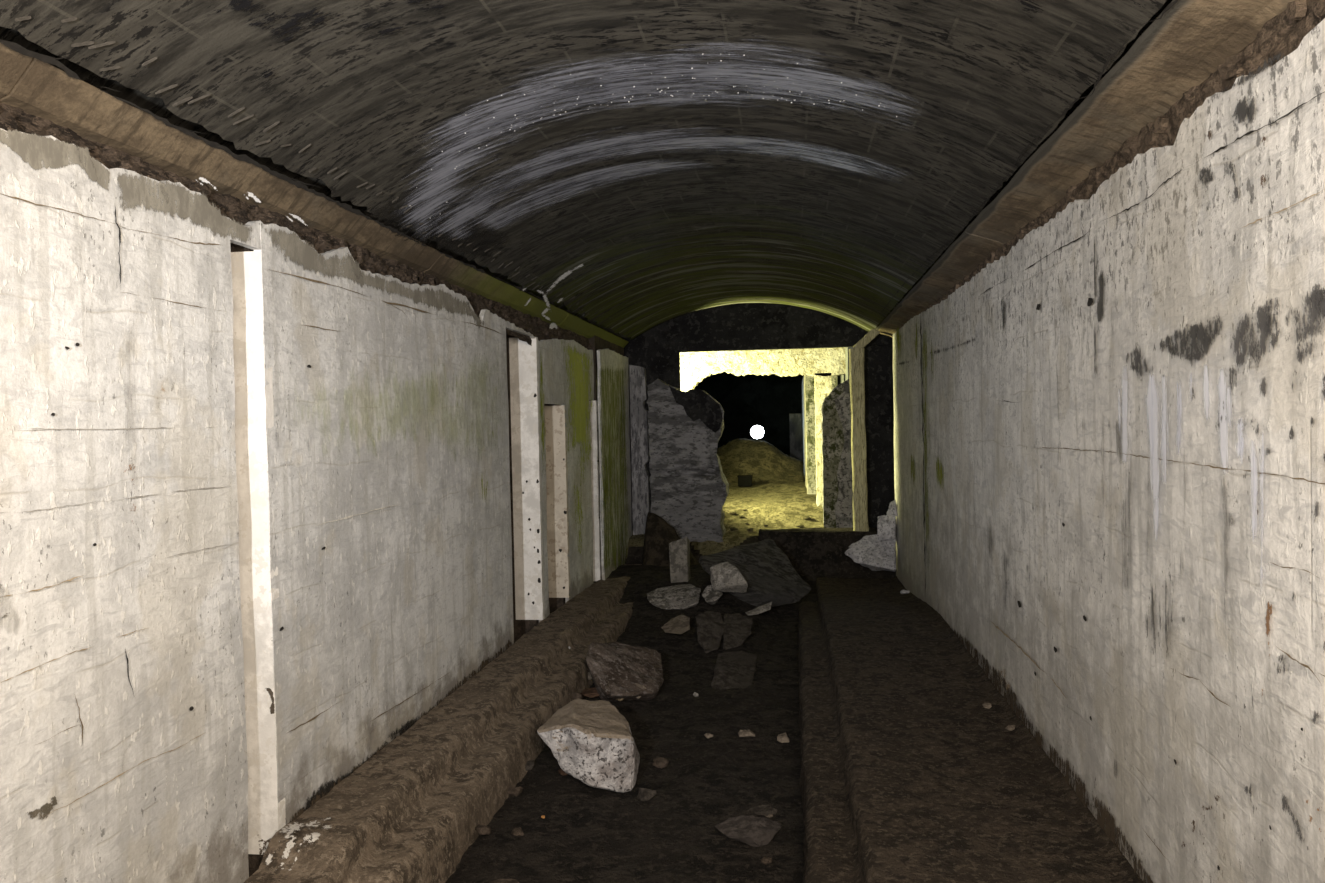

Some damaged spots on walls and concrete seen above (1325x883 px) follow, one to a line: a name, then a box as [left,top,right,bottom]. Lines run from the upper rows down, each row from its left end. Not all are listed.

spalling [0,102,592,350]
spalling [922,0,1325,312]
crack [984,92,1324,293]
crack [2,576,81,597]
crack [0,486,228,513]
crack [919,323,927,598]
crack [1039,302,1325,484]
water stain [1103,284,1325,540]